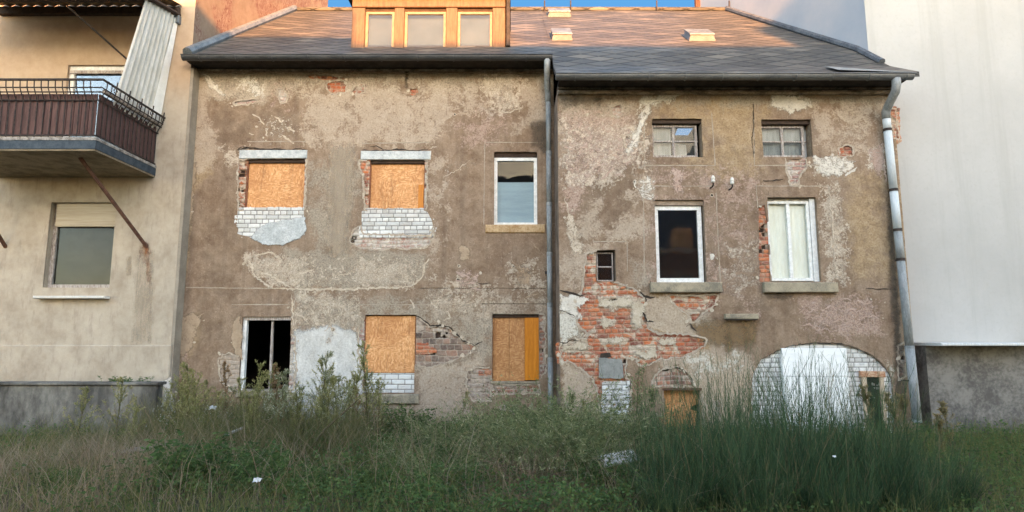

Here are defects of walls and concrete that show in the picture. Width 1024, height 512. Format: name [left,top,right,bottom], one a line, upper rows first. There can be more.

spalling [308,75,366,96]
peeling [771,95,812,116]
peeling [868,106,902,181]
spalling [242,95,719,424]
spalling [756,205,770,282]
peeling [785,144,857,284]
peeling [180,312,205,357]
spalling [217,316,244,392]